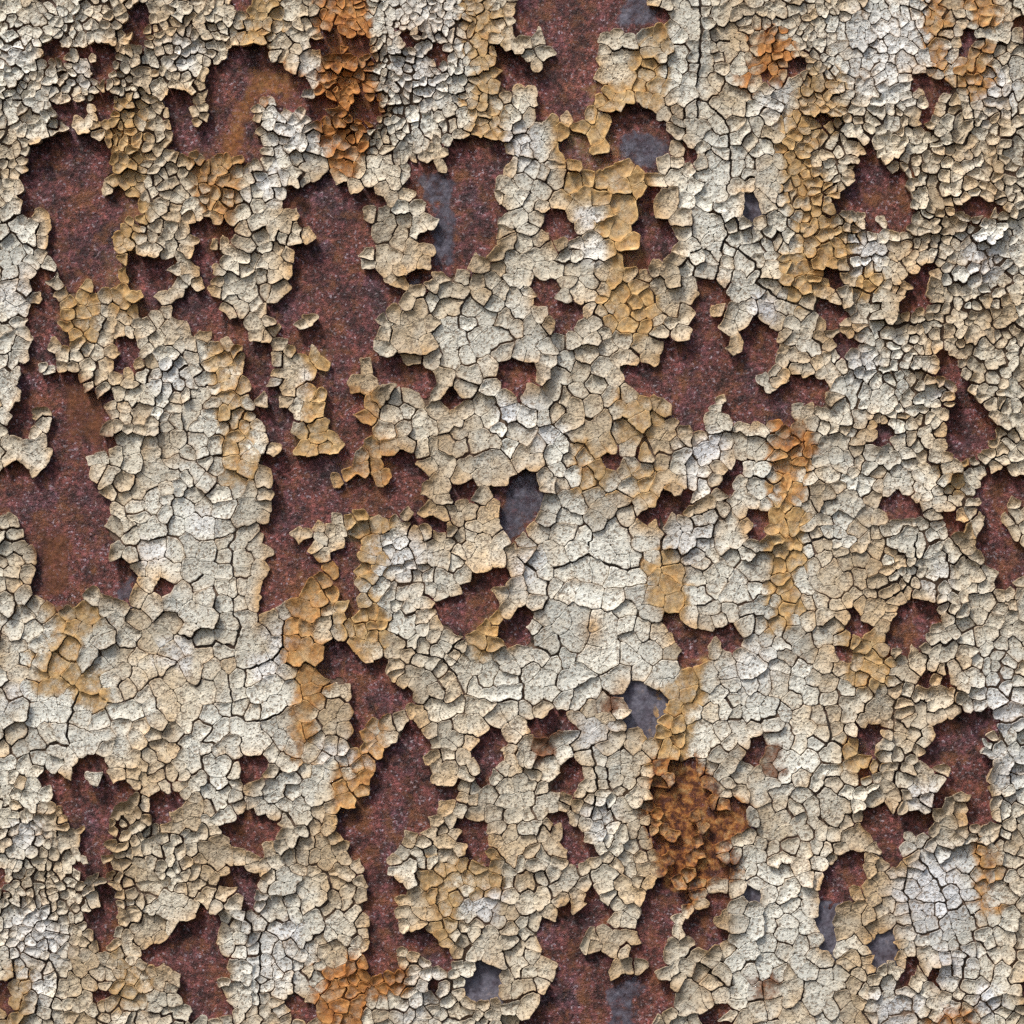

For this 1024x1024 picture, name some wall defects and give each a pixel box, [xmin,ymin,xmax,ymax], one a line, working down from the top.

rust [298,0,385,178]
crack [696,0,727,83]
rust [740,24,796,88]
crack [691,212,795,305]
peeling [605,274,845,446]
peeling [0,0,783,1024]
peeling [863,340,1024,603]
crack [175,549,241,648]
crack [521,516,665,685]
rust [640,658,750,909]
peeling [798,586,1011,1009]
crack [903,862,976,972]